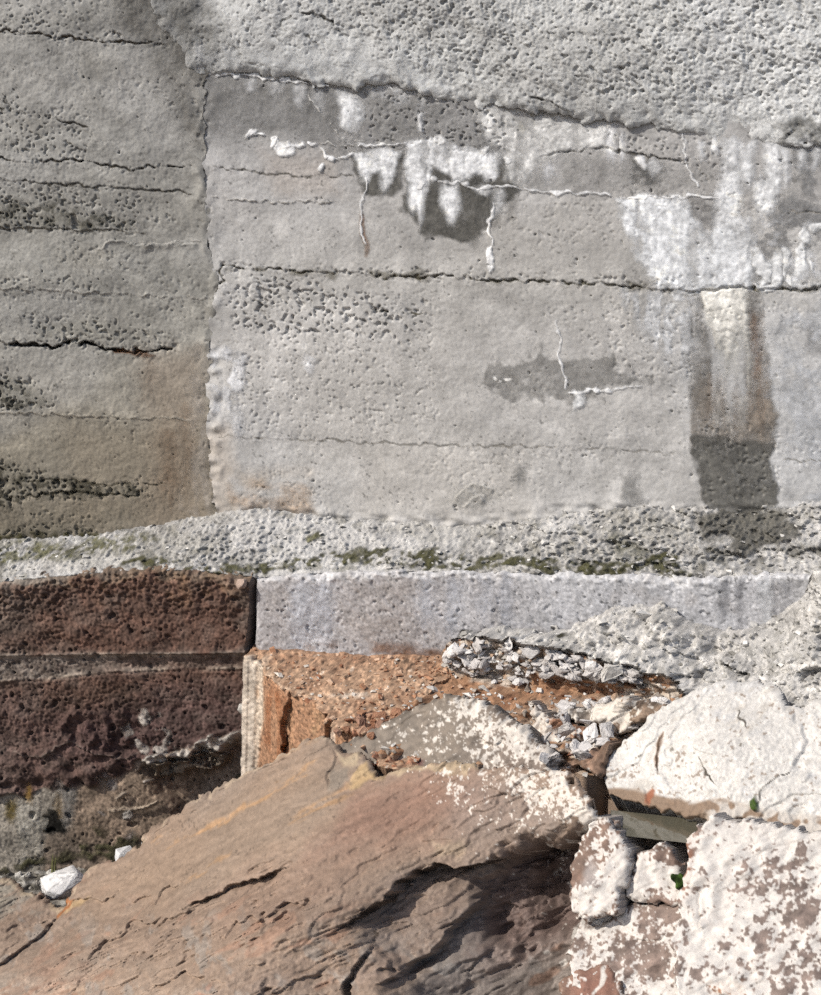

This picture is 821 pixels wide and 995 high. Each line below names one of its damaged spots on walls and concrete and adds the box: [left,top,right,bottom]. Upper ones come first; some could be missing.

crack [0,28,150,44]
water stain [121,0,211,64]
crack [0,156,368,244]
crack [376,203,818,294]
crack [12,341,169,354]
water stain [170,52,821,563]